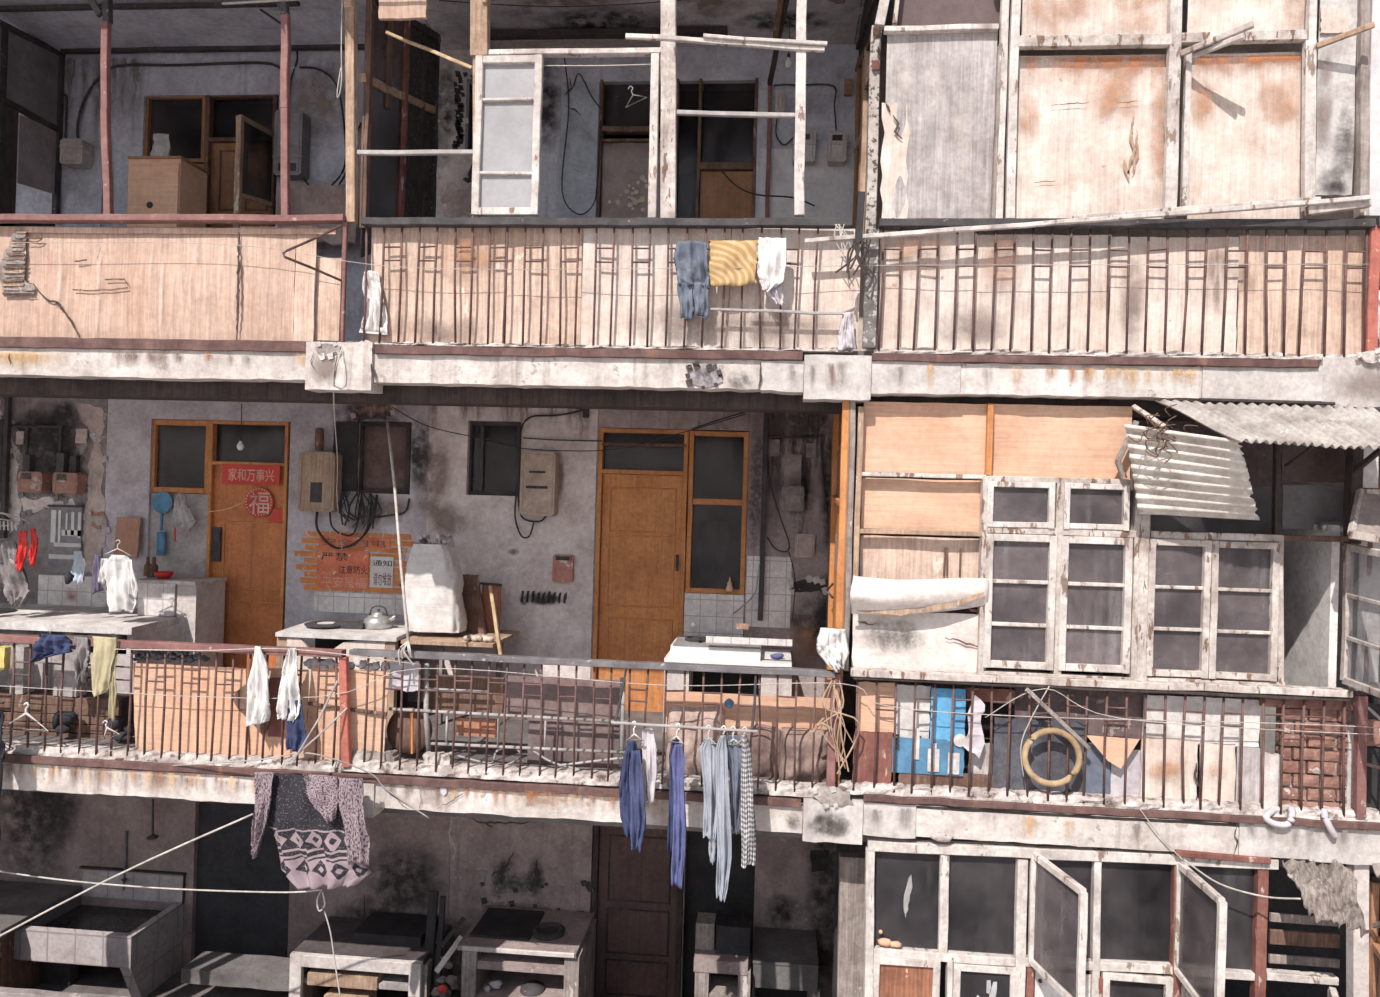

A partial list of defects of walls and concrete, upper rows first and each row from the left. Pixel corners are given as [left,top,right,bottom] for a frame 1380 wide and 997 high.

rust [1057,55,1161,112]
rust [1198,55,1301,65]
crack [25,281,80,338]
peeling [8,403,110,573]
rust [122,771,254,787]
leakage [492,852,542,897]